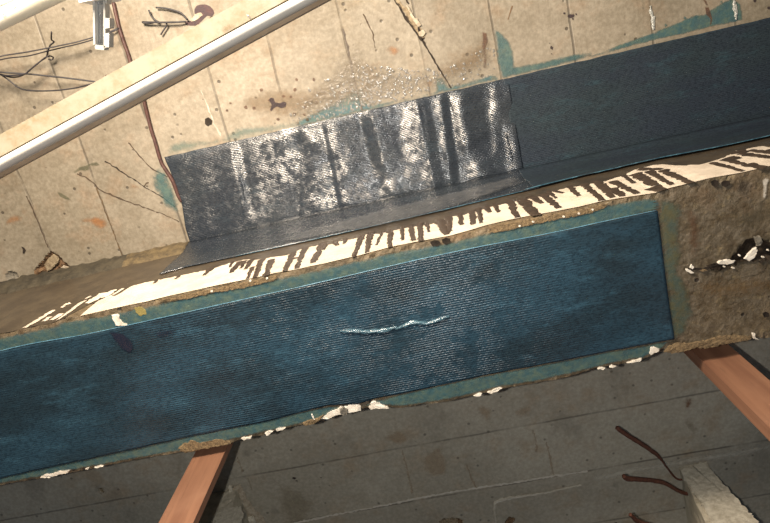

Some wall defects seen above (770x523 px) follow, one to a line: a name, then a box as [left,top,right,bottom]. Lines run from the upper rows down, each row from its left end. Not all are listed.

spalling [23,17,770,328]
crack [394,0,452,88]
damp [289,32,582,125]
spalling [0,210,758,478]